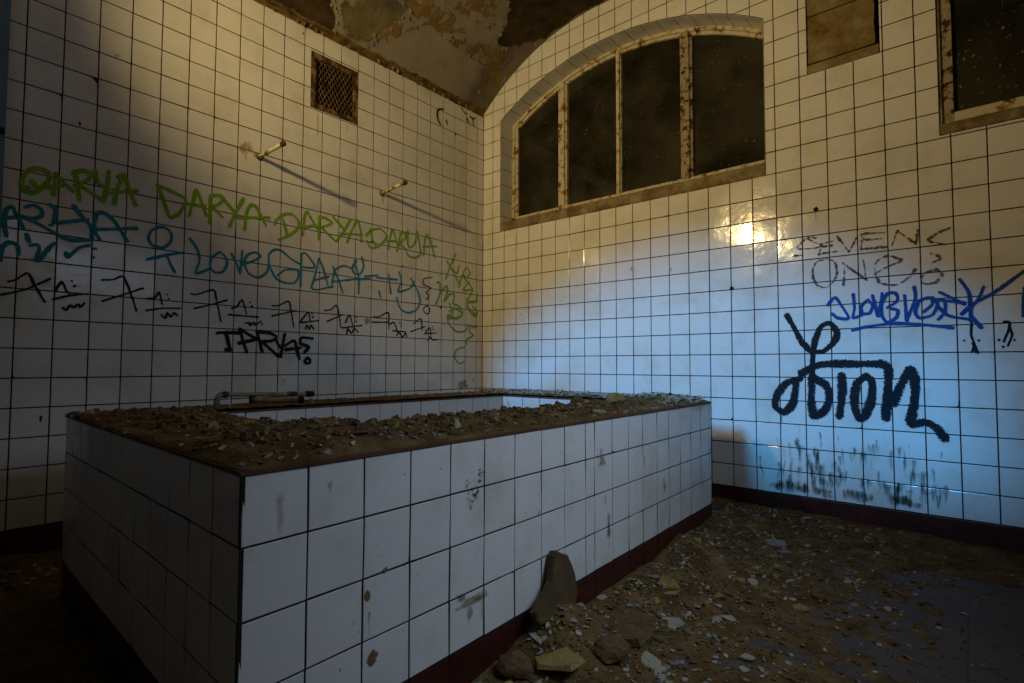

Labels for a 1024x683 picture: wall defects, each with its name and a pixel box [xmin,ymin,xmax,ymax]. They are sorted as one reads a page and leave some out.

spalling [254,0,604,117]
corrosion [367,649,378,666]